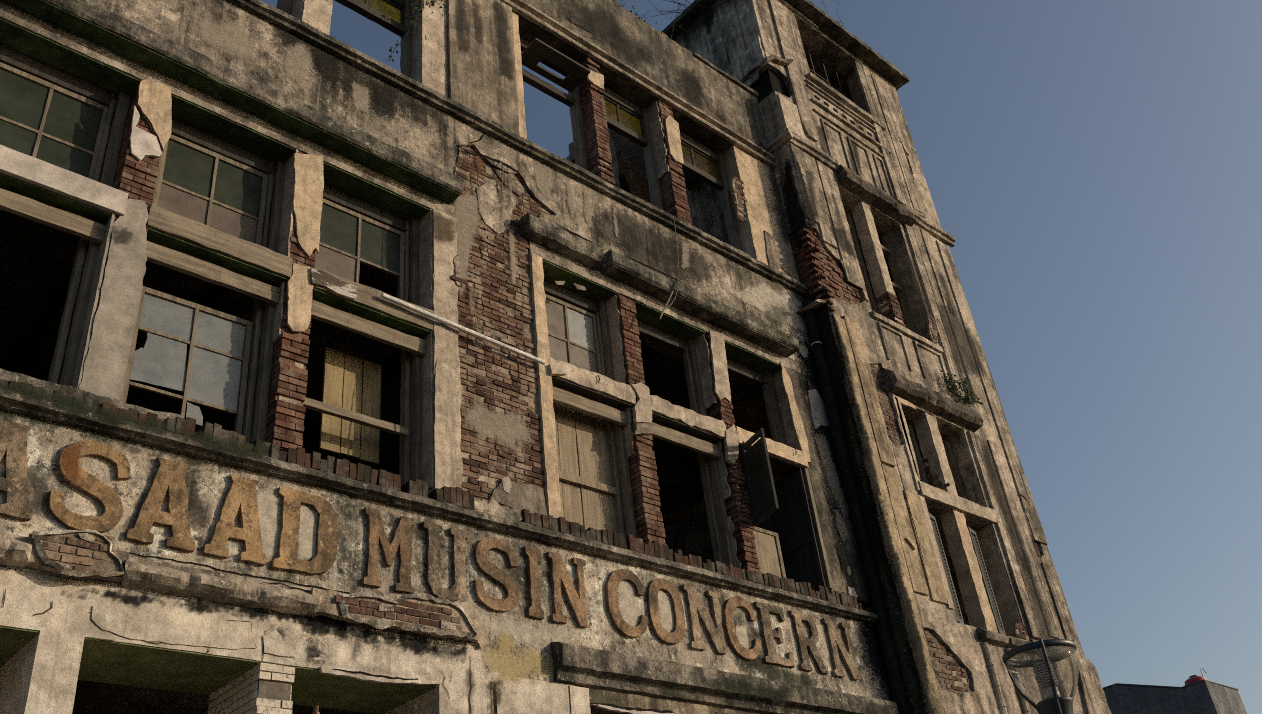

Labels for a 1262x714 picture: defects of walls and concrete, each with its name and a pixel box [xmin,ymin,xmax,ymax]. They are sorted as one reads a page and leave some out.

flaking render [129,79,172,161]
damp [456,0,513,81]
flaking render [587,71,604,91]
flaking render [664,116,684,165]
spalling [451,144,557,242]
flaking render [287,153,358,333]
spalling [764,221,906,327]
spalling [31,529,125,577]
damp [80,588,164,607]
damp [181,598,502,713]
spalling [336,590,491,649]
damp [480,610,572,652]